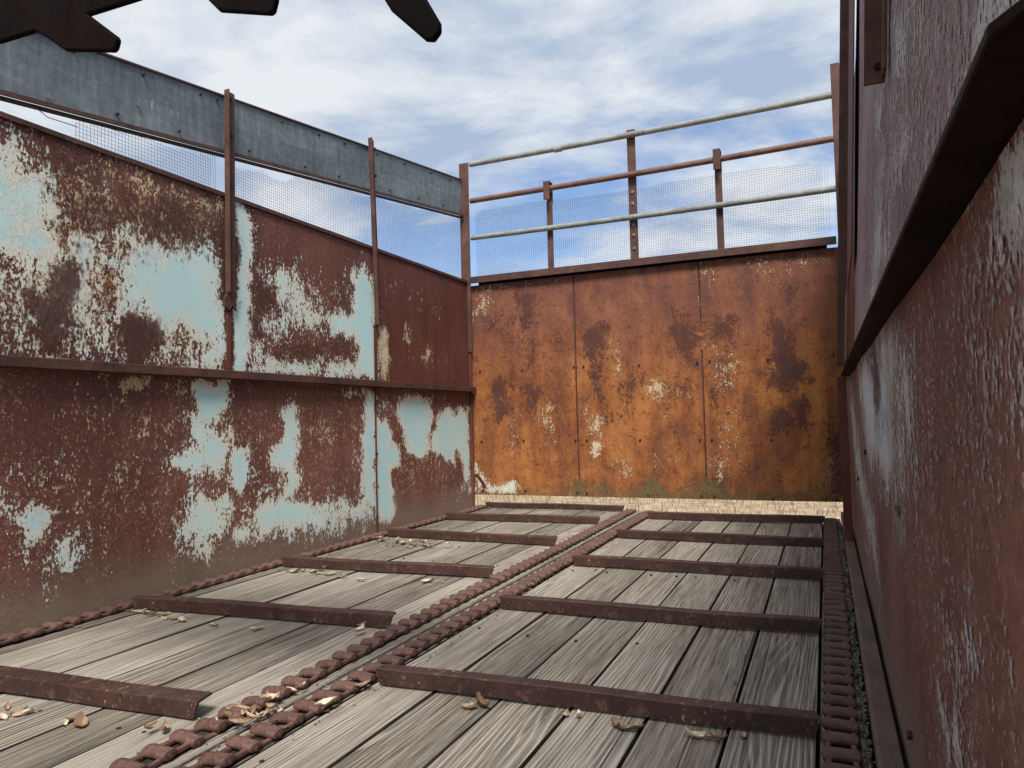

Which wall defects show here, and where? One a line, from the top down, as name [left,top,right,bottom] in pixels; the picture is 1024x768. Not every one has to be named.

corrosion [11,121,354,371]
peeling [0,119,521,608]
corrosion [484,281,739,431]
corrosion [760,308,842,501]
corrosion [869,339,885,457]